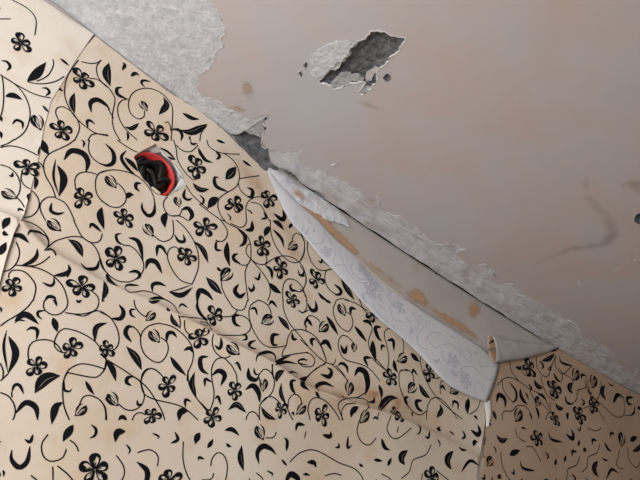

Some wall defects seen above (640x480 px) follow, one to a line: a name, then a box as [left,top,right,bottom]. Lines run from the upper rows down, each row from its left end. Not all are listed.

peeling [51,0,640,394]